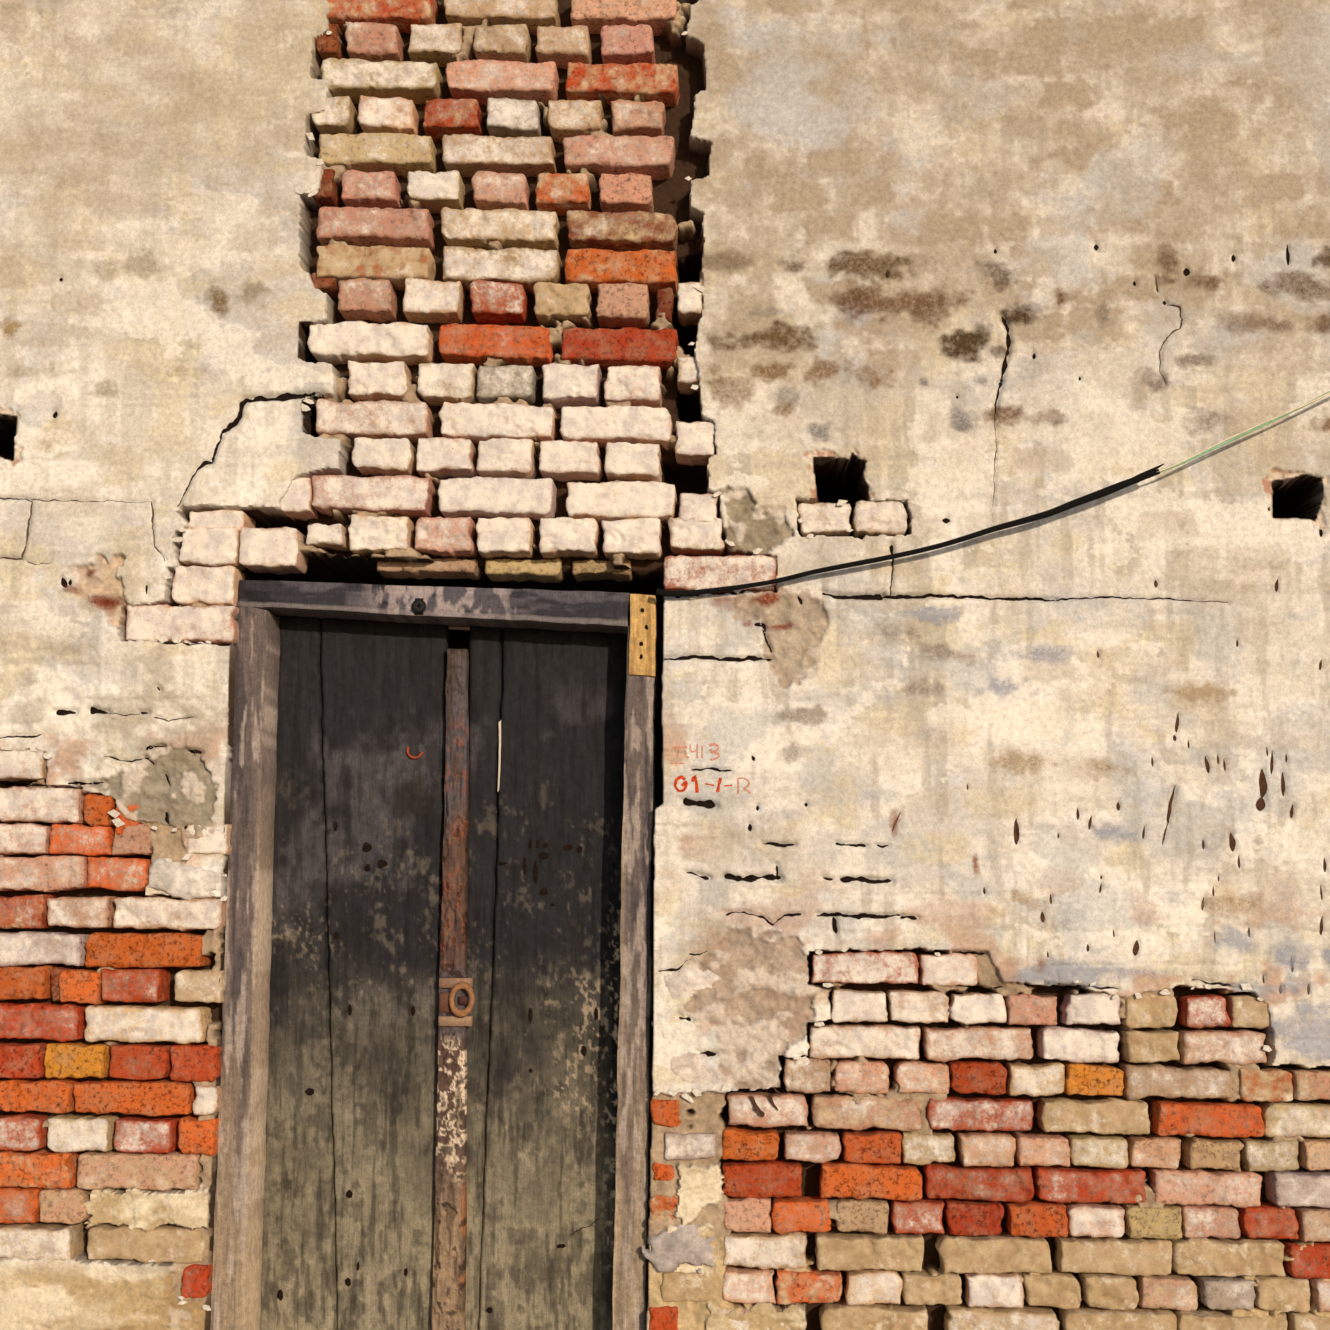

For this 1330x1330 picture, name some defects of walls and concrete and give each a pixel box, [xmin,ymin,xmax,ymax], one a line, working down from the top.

flaking render [117,0,778,646]
water stain [711,321,813,379]
water stain [828,252,945,323]
water stain [942,328,1005,362]
crack [993,317,1011,499]
water stain [1002,306,1033,324]
crack [0,392,325,594]
crack [822,545,1228,603]
crack [2,687,202,829]
flaking render [1256,748,1294,819]
flaking render [0,742,232,1311]
flaking render [646,948,1330,1330]